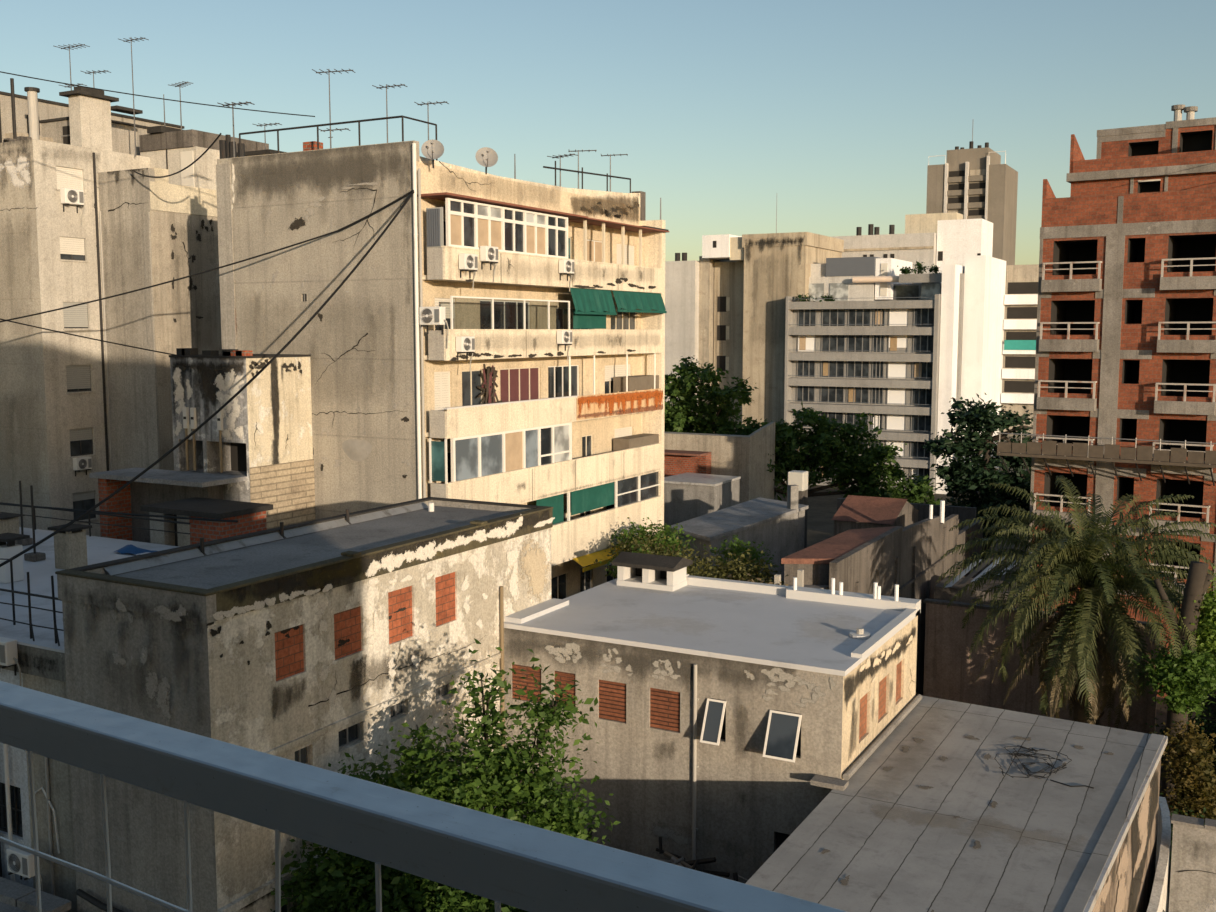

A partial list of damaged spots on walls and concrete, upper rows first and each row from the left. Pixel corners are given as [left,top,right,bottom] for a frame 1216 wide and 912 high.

damp [234,144,407,193]
damp [571,197,639,221]
crack [316,333,375,383]
peeling [172,367,193,439]
peeling [213,359,302,441]
crack [312,410,403,425]
peeling [365,514,555,603]
peeling [387,641,420,679]
peeling [545,642,582,664]
peeling [598,648,633,677]
peeling [652,659,681,680]
peeling [859,635,913,683]